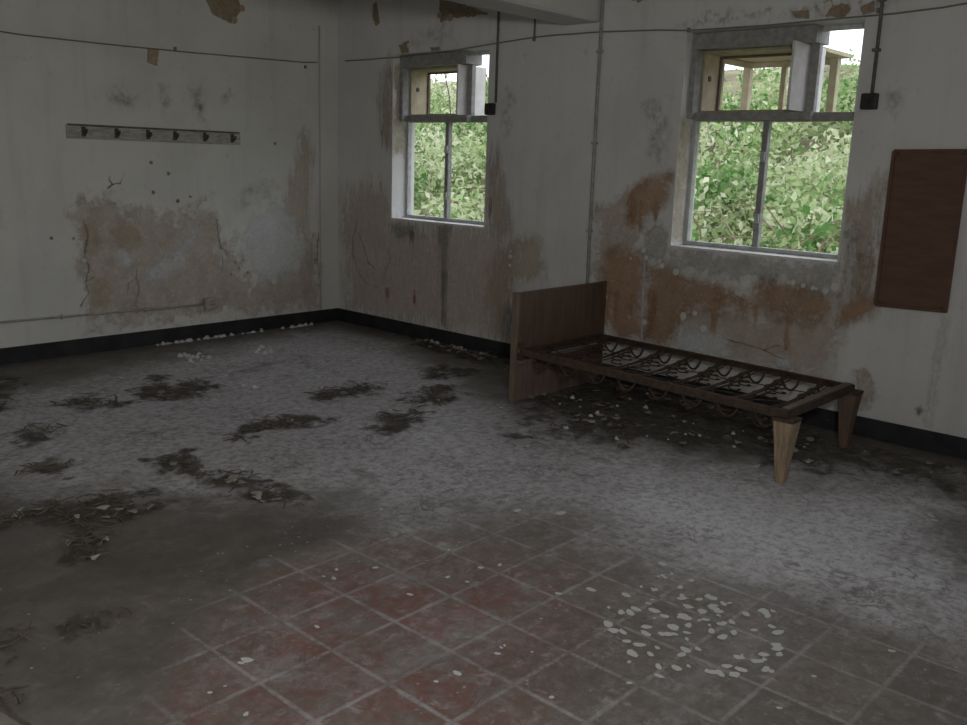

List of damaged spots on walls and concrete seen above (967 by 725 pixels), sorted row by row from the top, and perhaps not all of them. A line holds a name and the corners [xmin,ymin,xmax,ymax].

peeling [206,0,245,24]
peeling [604,263,830,367]